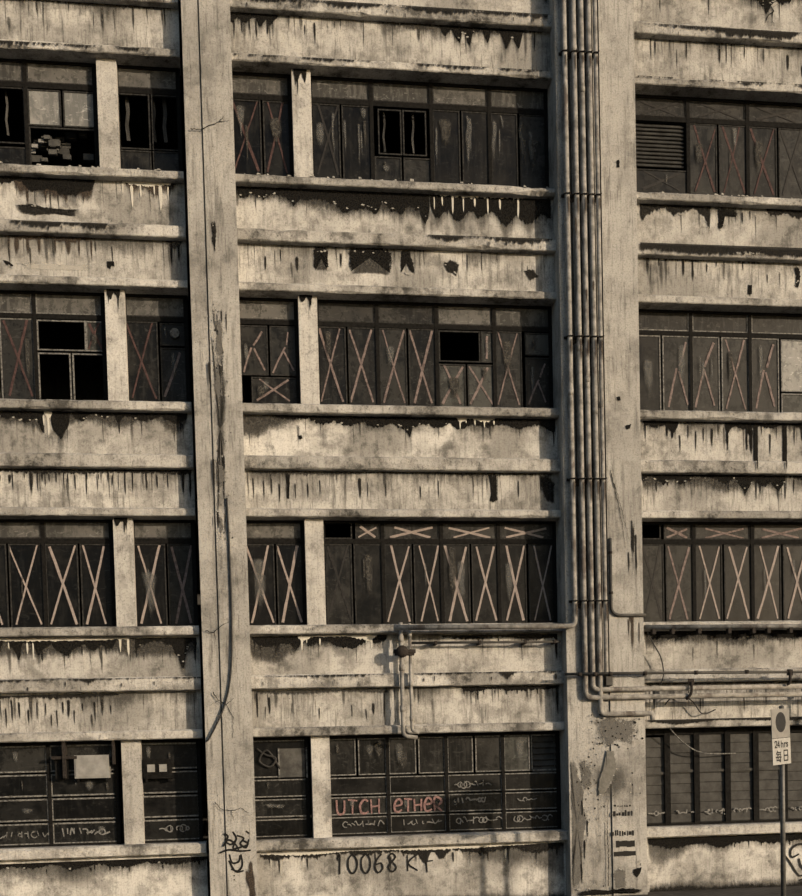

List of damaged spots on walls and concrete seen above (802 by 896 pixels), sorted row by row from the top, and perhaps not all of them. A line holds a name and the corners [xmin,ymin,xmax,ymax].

damp [653,23,802,69]
damp [11,220,182,271]
spalling [313,247,329,270]
spalling [340,248,415,276]
spalling [444,255,468,276]
damp [428,194,552,270]
damp [640,242,802,282]
damp [566,0,608,621]
damp [0,678,144,727]
damp [0,637,203,719]
peeling [570,714,645,896]
damp [648,833,802,863]